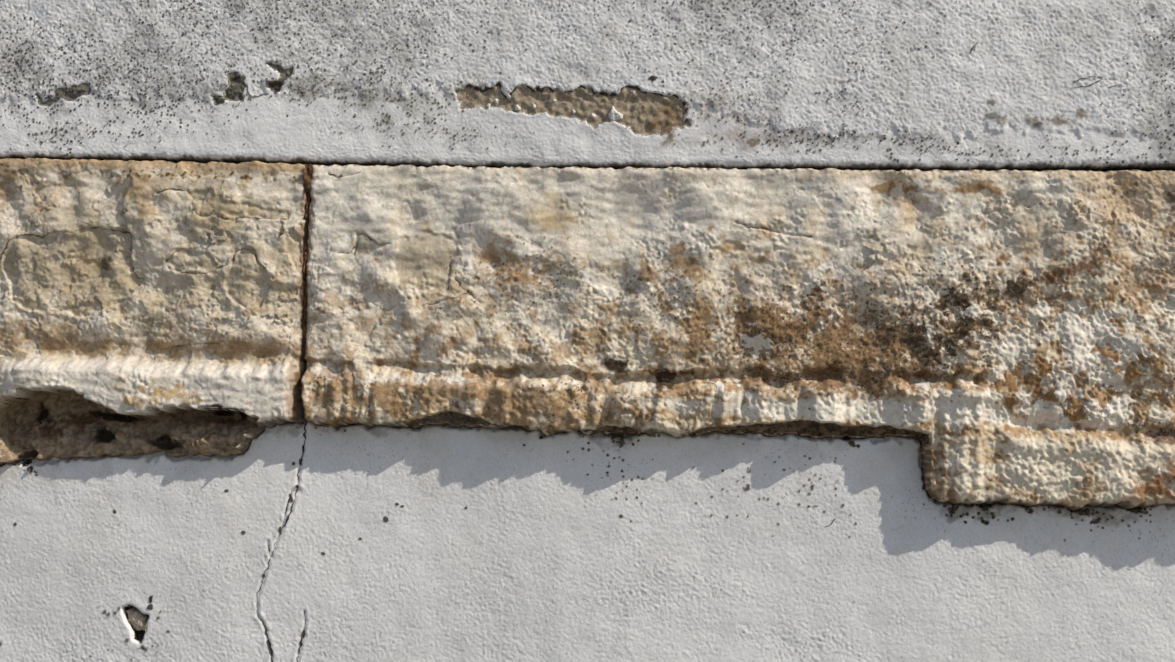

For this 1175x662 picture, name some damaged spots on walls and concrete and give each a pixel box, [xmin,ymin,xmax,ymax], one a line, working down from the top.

flaking render [211,62,293,106]
flaking render [455,76,695,136]
spalling [0,387,260,464]
crack [257,422,307,662]
flaking render [103,595,170,653]